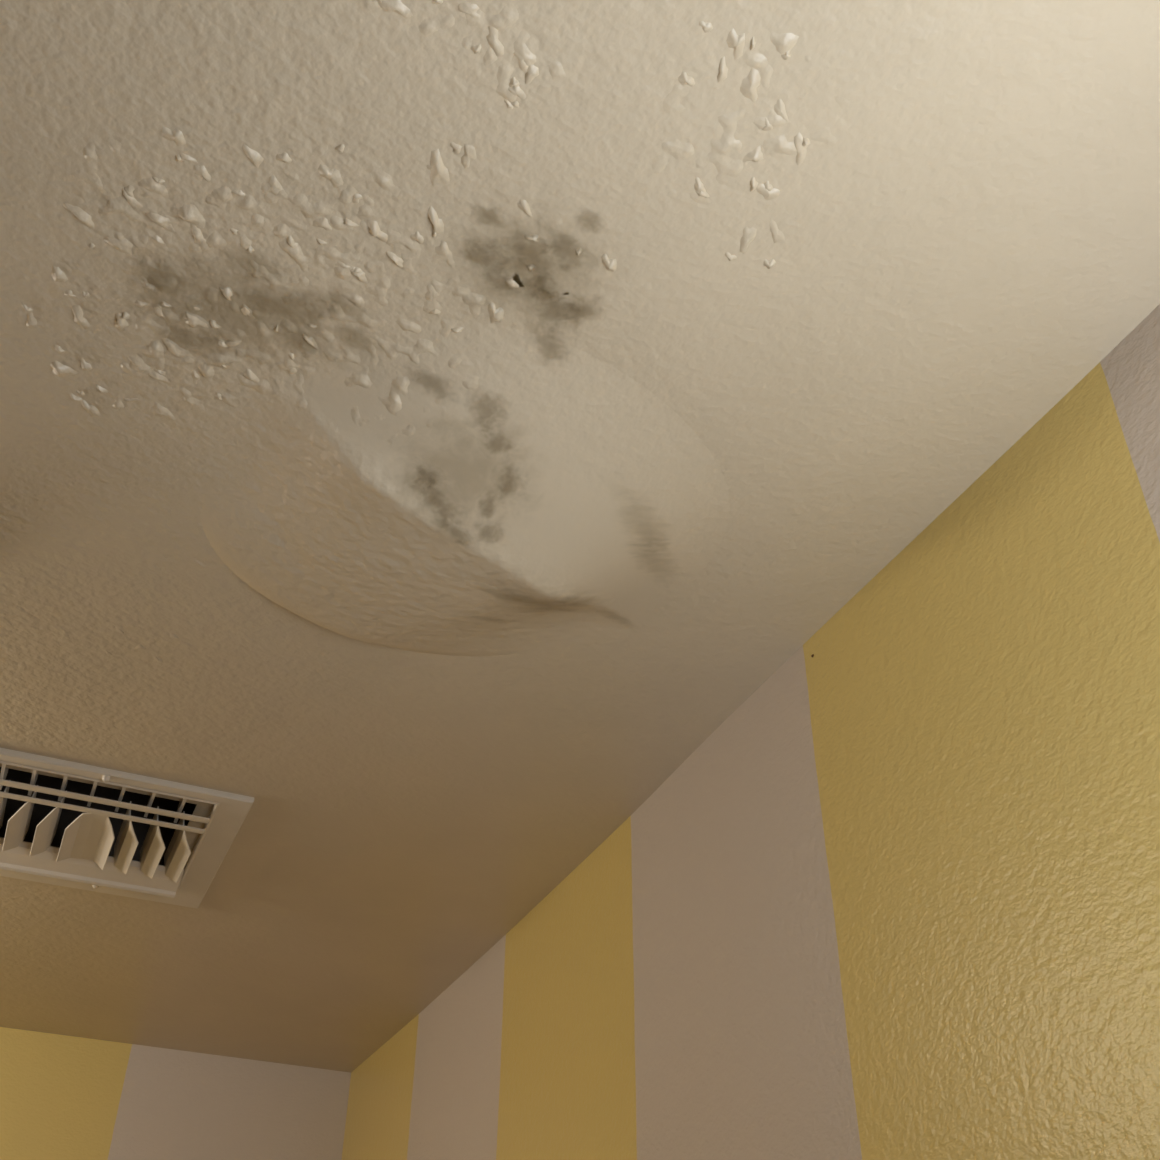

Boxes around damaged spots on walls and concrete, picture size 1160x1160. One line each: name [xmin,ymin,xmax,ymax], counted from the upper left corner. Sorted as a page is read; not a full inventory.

peeling [49,265,90,330]
peeling [63,126,526,446]
peeling [50,345,97,377]